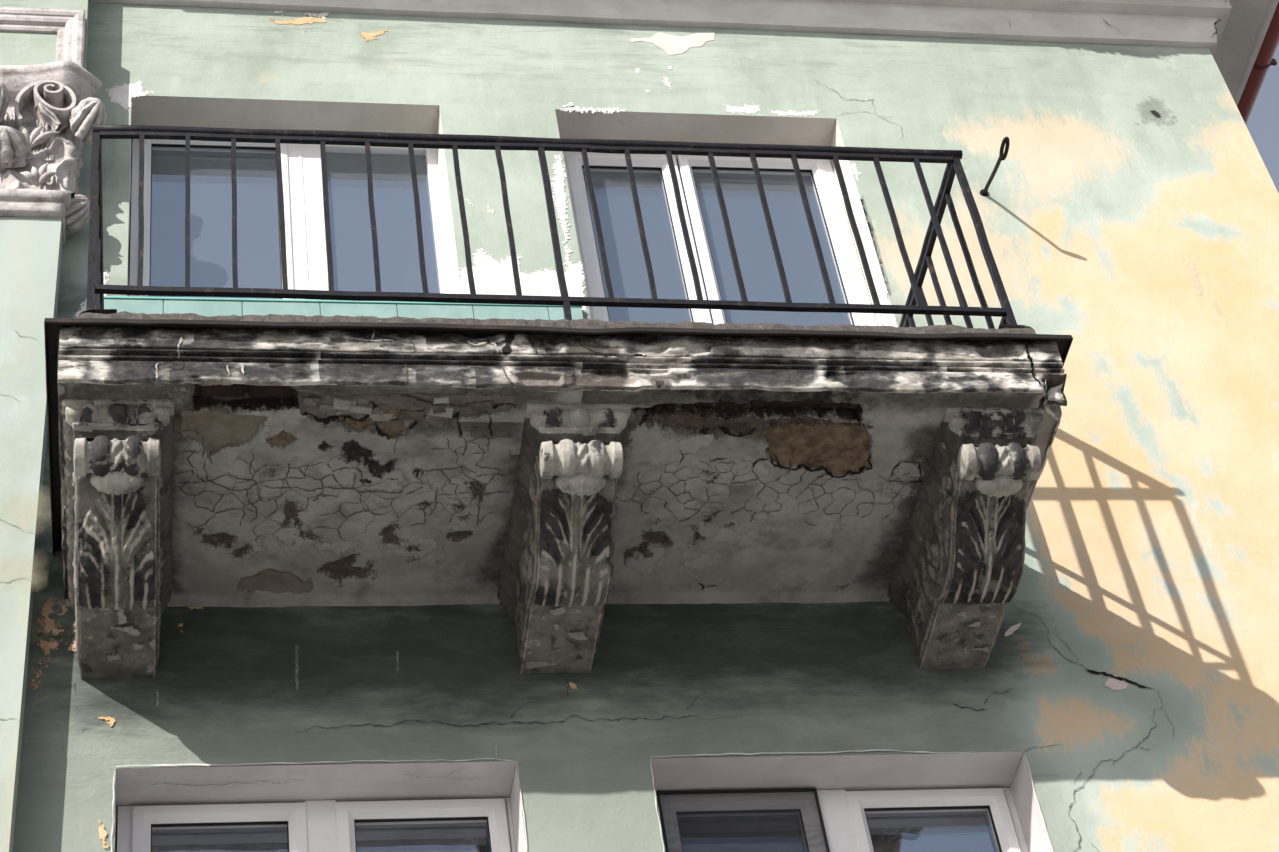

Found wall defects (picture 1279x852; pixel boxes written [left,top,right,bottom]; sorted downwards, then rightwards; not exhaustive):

peeling [106,82,155,113]
spalling [630,32,715,89]
flaking render [456,154,589,311]
crack [155,337,182,381]
flaking render [89,329,313,530]
crack [173,330,647,547]
spalling [380,333,626,391]
crack [639,409,649,425]
flaking render [598,340,863,457]
crack [615,426,927,526]
crack [295,678,736,733]
crack [1014,605,1175,852]